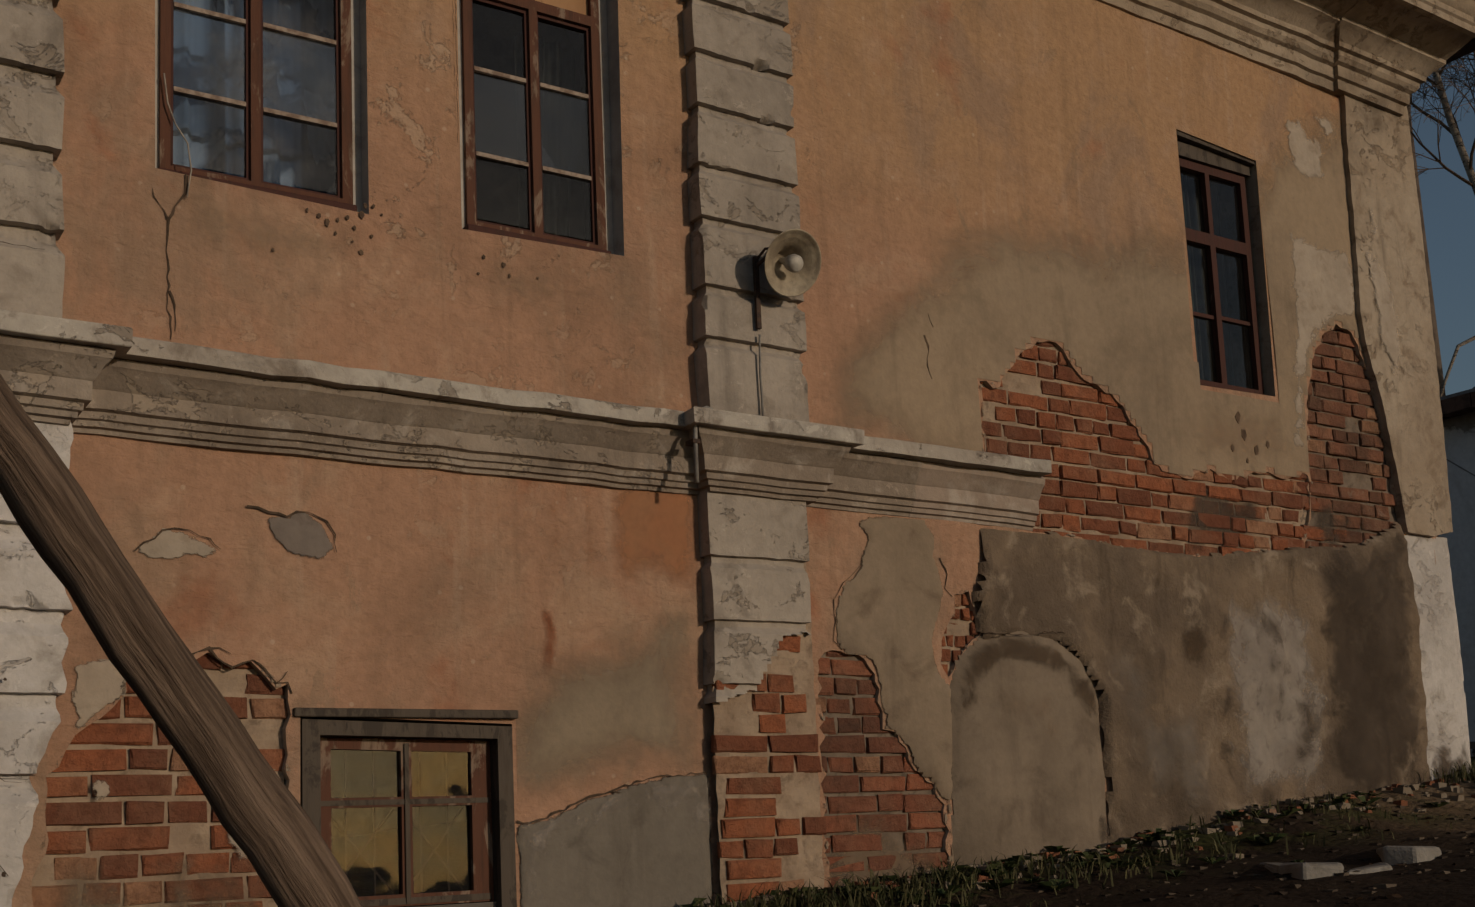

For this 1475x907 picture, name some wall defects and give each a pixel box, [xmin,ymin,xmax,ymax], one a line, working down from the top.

peeling [1286,117,1333,177]
crack [152,174,188,340]
flaking render [980,234,1401,559]
peeling [134,527,220,559]
peeling [247,505,337,559]
flaking render [941,590,983,677]
damp [1319,509,1418,789]
flaking render [32,659,278,907]
flaking render [193,652,291,788]
flaking render [711,621,950,904]
damp [1435,747,1468,778]